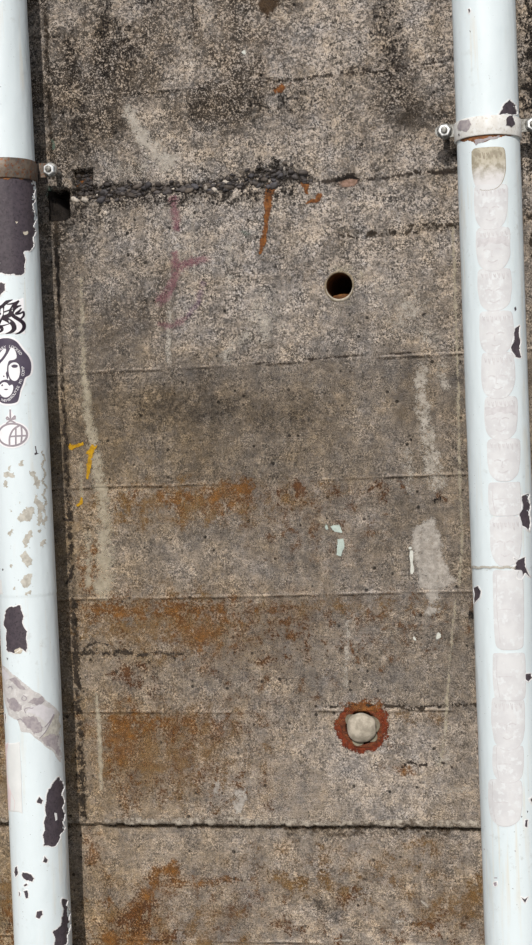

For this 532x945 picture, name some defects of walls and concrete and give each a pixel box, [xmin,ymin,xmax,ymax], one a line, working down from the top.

leakage [517,0,532,113]
corrosion [258,184,275,254]
leakage [373,226,464,615]
corrosion [57,540,473,817]
leakage [439,675,450,768]
corrosion [72,825,485,945]